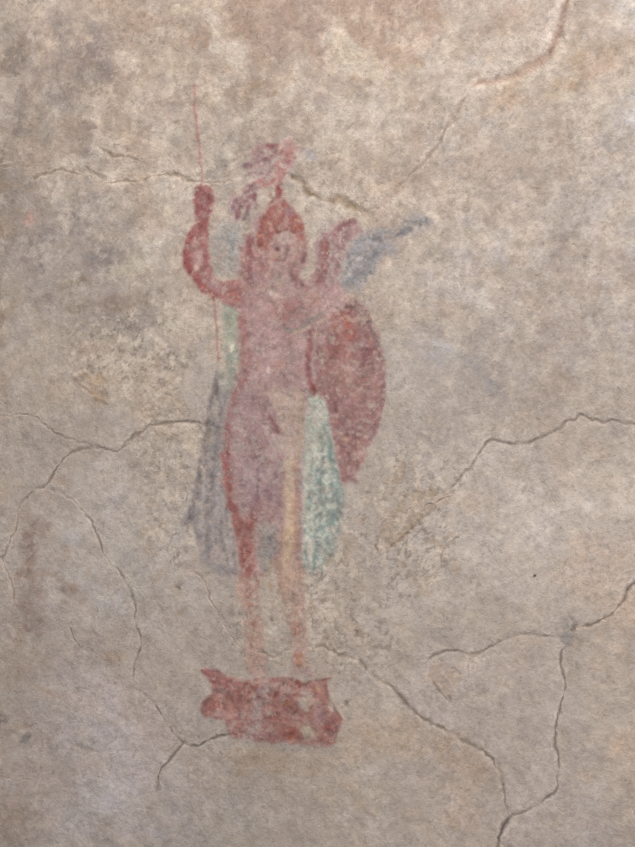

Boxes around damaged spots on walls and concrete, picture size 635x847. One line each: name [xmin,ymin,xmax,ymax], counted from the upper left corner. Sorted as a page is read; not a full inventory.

crack [291,0,569,212]
crack [0,149,227,187]
crack [424,413,635,506]
crack [0,518,19,598]
crack [9,413,203,679]
crack [147,695,233,789]
crack [314,580,635,847]